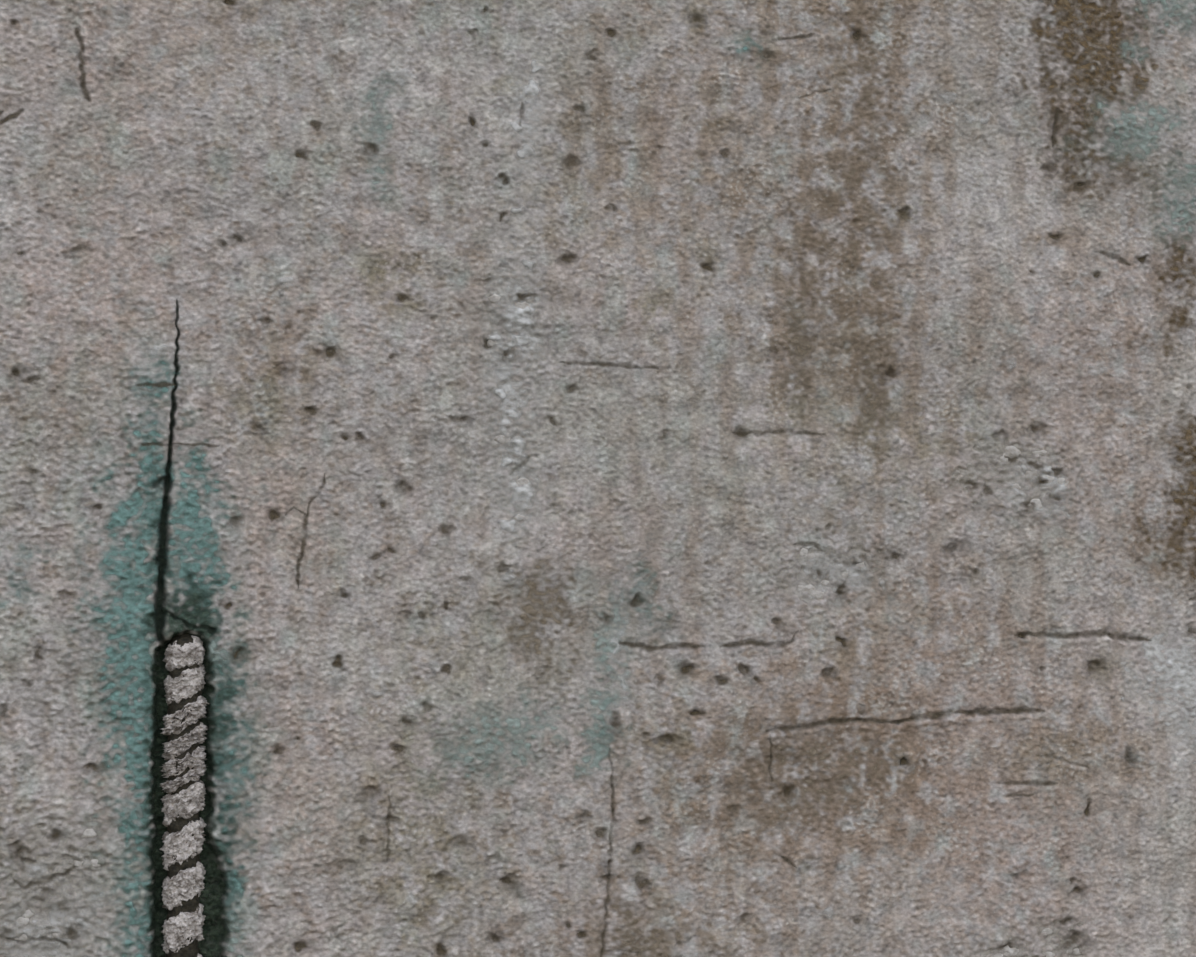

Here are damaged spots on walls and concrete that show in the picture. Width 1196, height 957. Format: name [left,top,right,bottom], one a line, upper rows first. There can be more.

crack [137,300,216,641]
leakage [78,412,247,957]
spalling [149,633,228,957]
crack [766,708,1033,779]
crack [1015,631,1151,641]